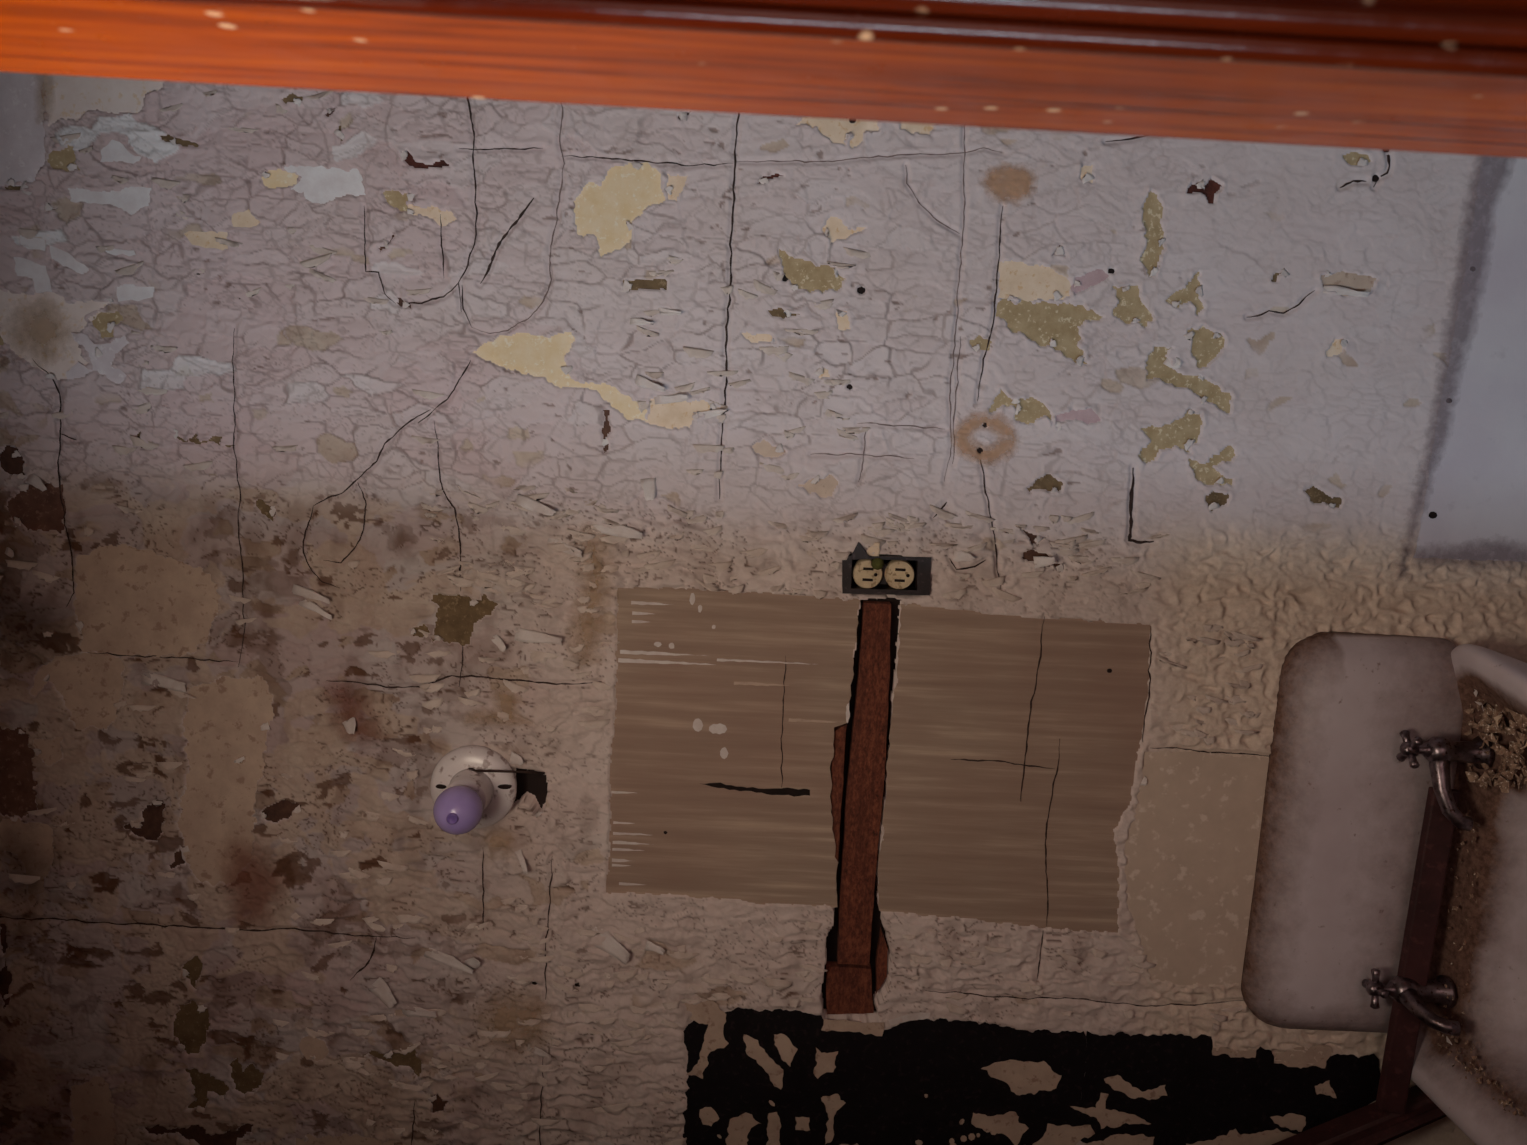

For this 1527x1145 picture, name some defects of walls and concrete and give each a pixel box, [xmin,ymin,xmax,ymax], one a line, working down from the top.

crack [33,360,76,607]
crack [88,328,246,667]
flaking render [474,332,751,479]
crack [302,98,1003,591]
peeling [996,191,1166,366]
crack [1128,468,1154,544]
peeling [1138,272,1235,511]
crack [1252,290,1315,317]
crack [1340,155,1390,188]
flaking render [0,526,301,901]
flaking render [409,478,860,931]
flaking render [768,504,1269,987]